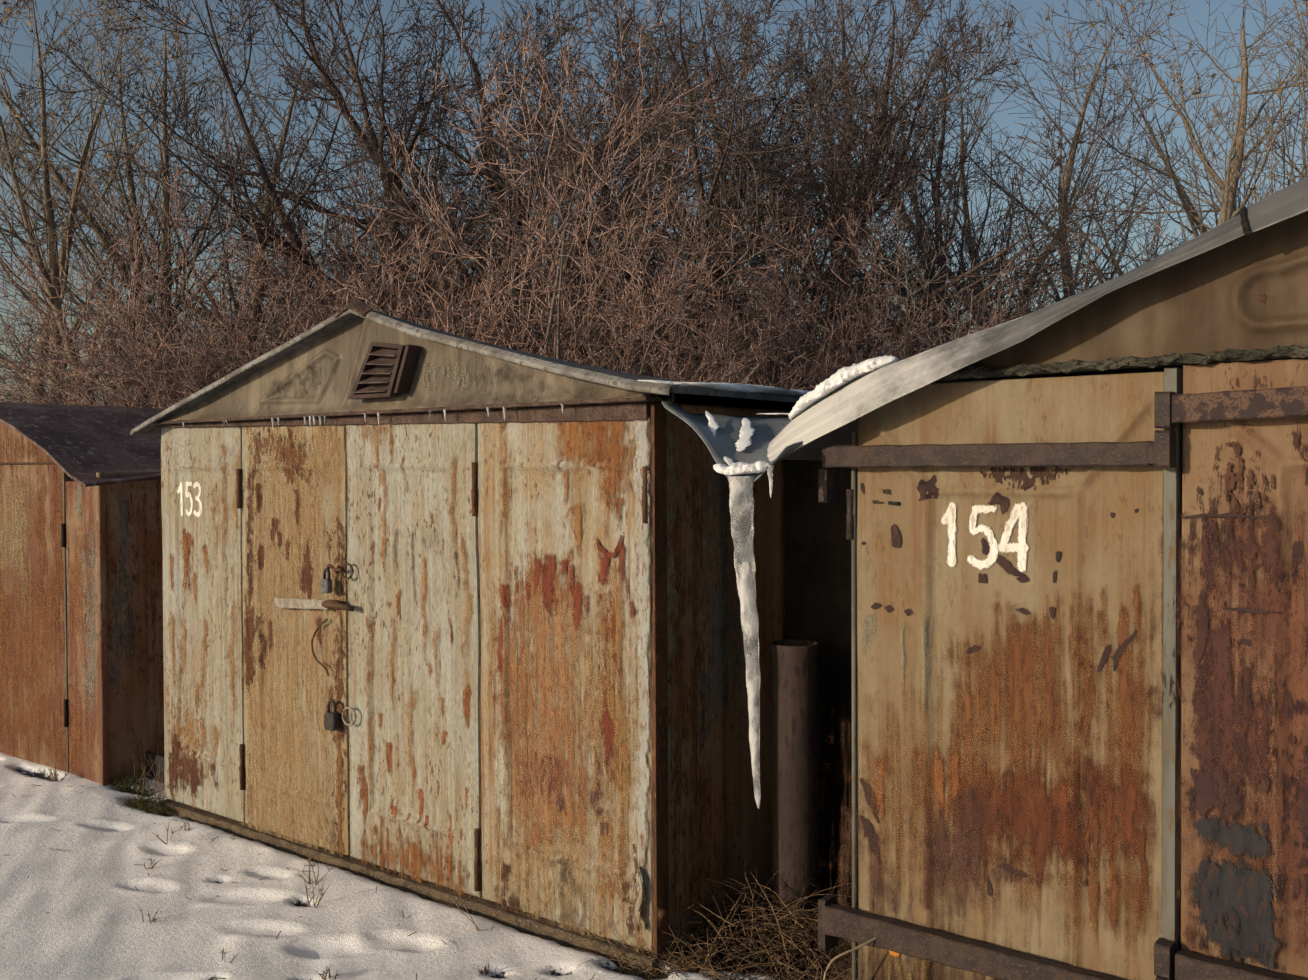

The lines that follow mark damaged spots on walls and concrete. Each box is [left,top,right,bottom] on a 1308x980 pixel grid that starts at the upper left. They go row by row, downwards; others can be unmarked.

rust [106,446,313,801]
rust [360,424,408,567]
rust [316,517,468,895]
rust [421,457,471,744]
rust [493,421,648,953]
rust [867,431,1308,960]
rust [487,863,525,911]